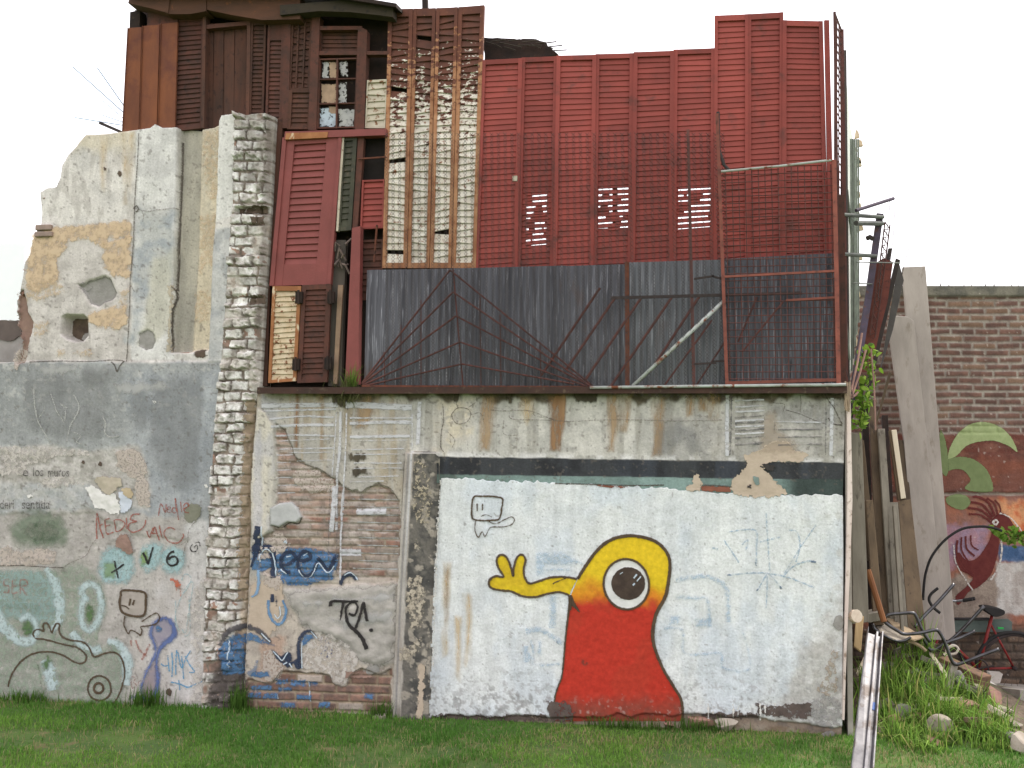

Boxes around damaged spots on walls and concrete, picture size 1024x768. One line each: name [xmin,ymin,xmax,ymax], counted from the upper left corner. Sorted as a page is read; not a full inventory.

peeling [13,220,132,370]
crack [30,134,184,372]
peeling [0,445,134,514]
spalling [235,399,398,687]
damp [432,480,441,666]
corrosion [550,395,566,450]
corrosion [653,399,663,455]
flaking render [686,441,808,499]